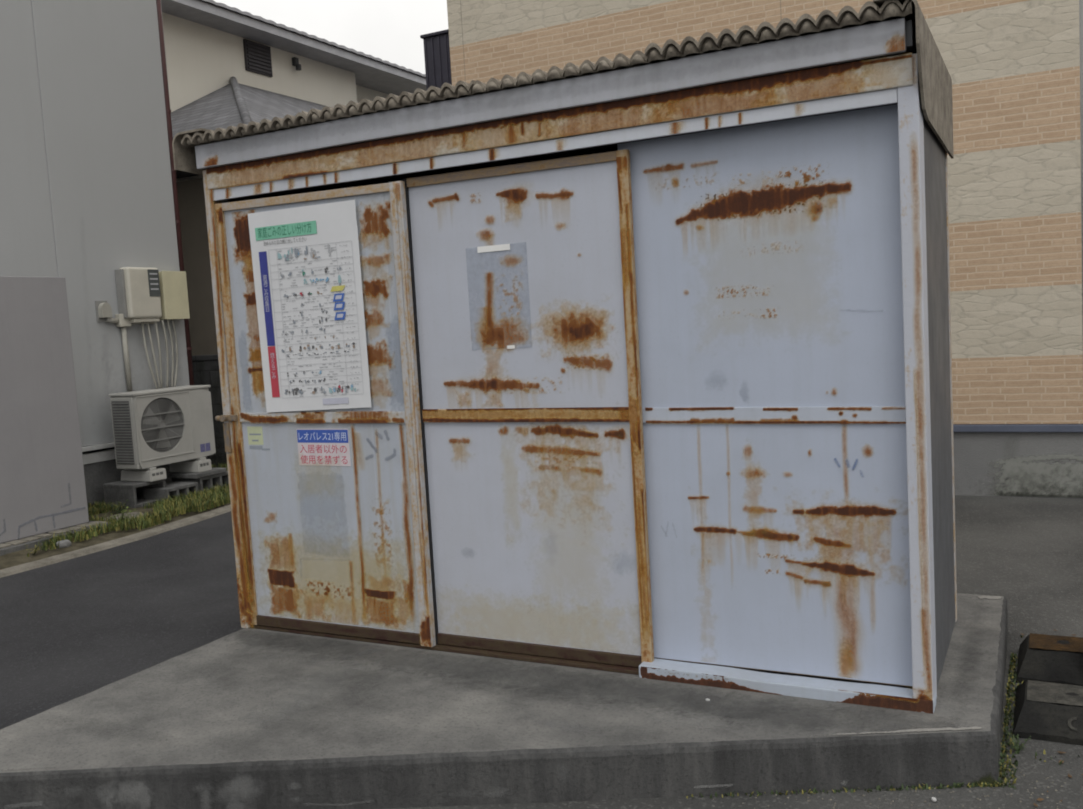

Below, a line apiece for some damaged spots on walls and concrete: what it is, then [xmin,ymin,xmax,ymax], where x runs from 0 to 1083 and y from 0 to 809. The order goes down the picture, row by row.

corrosion [204,38,914,393]
corrosion [228,156,922,647]
corrosion [694,526,875,674]
corrosion [841,610,933,702]